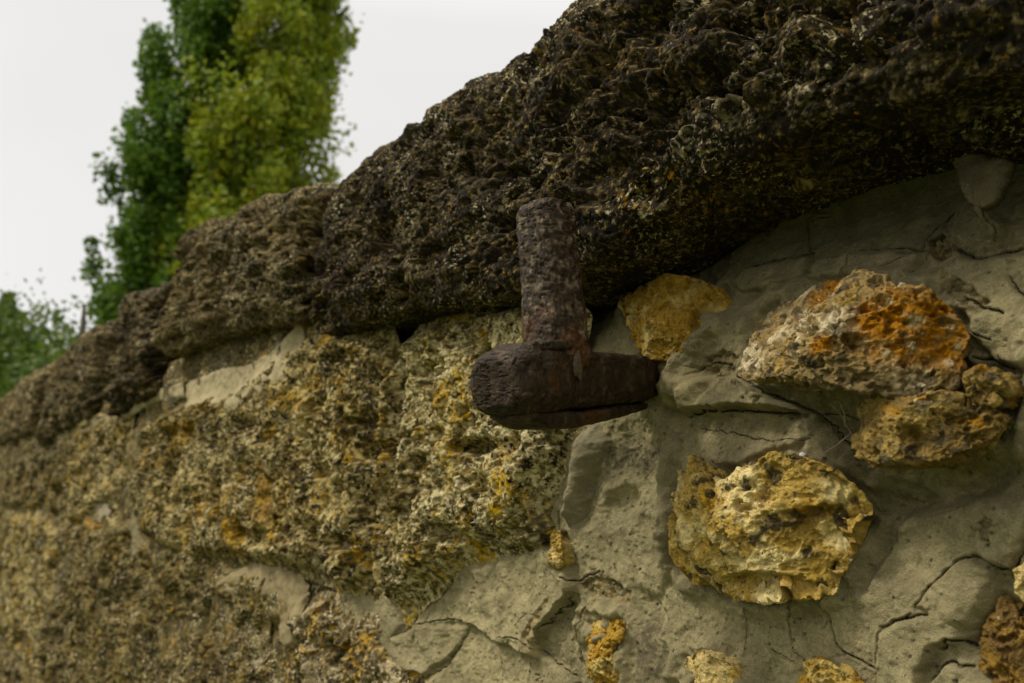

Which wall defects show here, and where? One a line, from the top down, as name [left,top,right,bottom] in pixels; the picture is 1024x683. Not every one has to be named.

crack [692,362,858,444]
crack [494,572,599,680]
crack [887,553,1024,627]
crack [942,638,980,669]